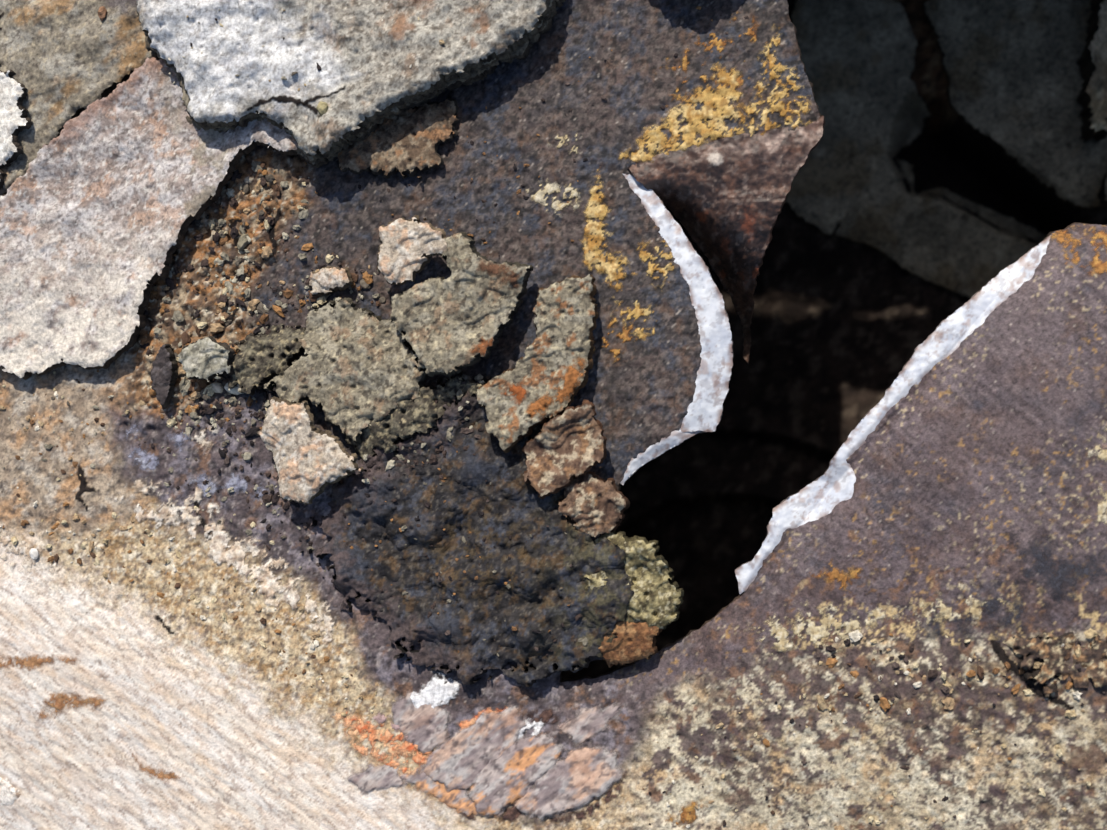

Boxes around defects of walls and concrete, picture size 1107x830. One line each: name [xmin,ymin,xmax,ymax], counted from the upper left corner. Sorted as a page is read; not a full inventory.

peeling [0,0,566,195]
crack [247,86,345,117]
corrosion [1051,230,1107,274]
peeling [258,169,684,668]
efflorescence [127,425,159,470]
efflorescence [173,432,190,451]
efflorescence [190,473,265,499]
water stain [927,537,1107,642]
corrosion [333,712,430,775]
corrosion [527,709,558,737]
corrosion [499,806,521,821]
corrosion [551,771,627,822]